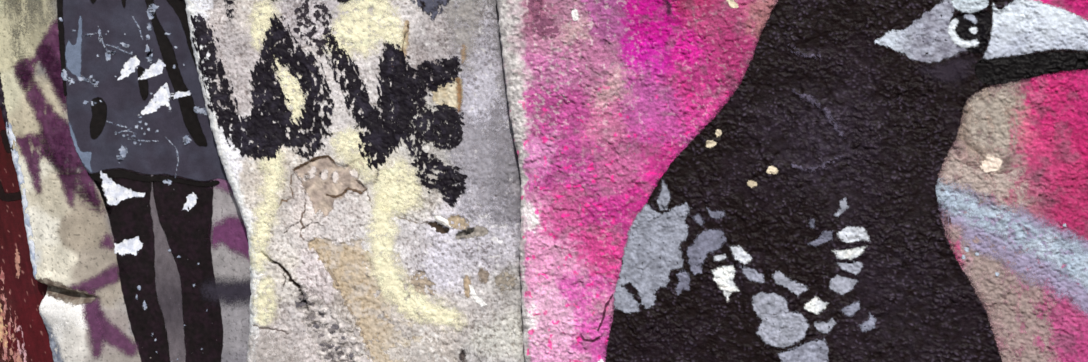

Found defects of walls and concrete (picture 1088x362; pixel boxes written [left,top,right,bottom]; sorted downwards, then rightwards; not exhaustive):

crack [276,176,323,240]
spalling [293,155,367,216]
crack [263,254,309,310]